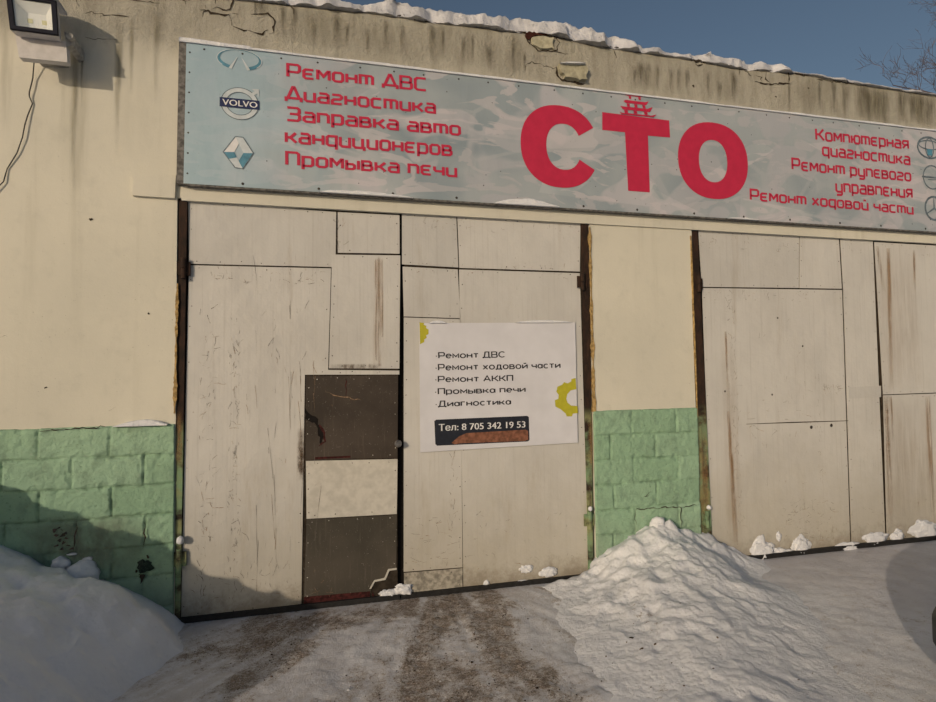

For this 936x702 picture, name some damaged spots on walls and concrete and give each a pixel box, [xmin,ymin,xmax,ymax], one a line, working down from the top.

crack [183,0,295,35]